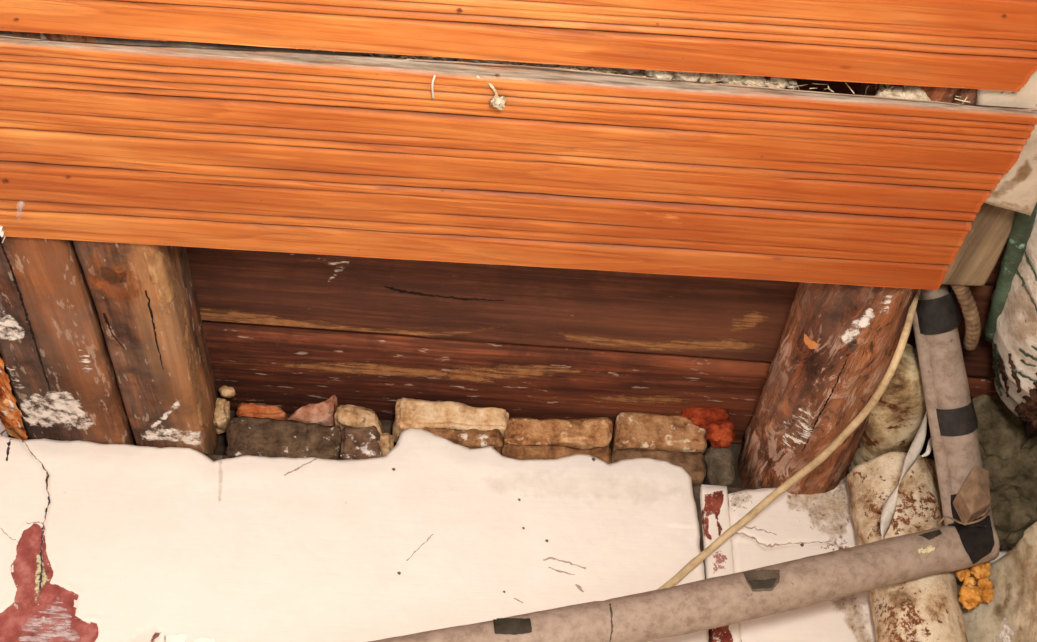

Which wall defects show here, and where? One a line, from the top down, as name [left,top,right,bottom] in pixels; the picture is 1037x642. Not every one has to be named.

crack [1,430,50,603]
crack [735,526,833,548]
rust [862,486,942,536]
peeling [0,523,99,642]
rust [875,593,931,642]